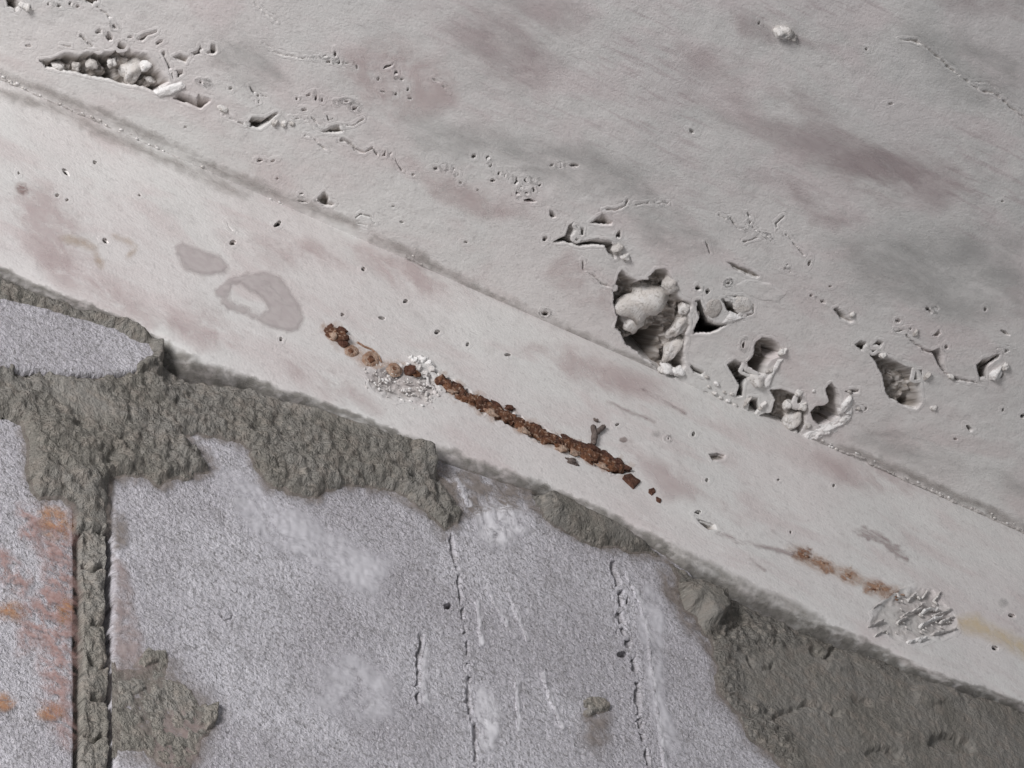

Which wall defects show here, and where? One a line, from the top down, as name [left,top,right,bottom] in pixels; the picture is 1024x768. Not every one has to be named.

spalling [92,21,236,113]
spalling [587,209,625,245]
water stain [177,244,302,331]
spalling [692,238,787,323]
corrosion [324,323,402,377]
spalling [724,335,783,415]
peeling [798,385,873,440]
spalling [851,336,887,356]
corrosion [795,548,905,601]
corrosion [0,508,73,730]
spalling [867,583,962,648]
spalling [412,629,429,711]